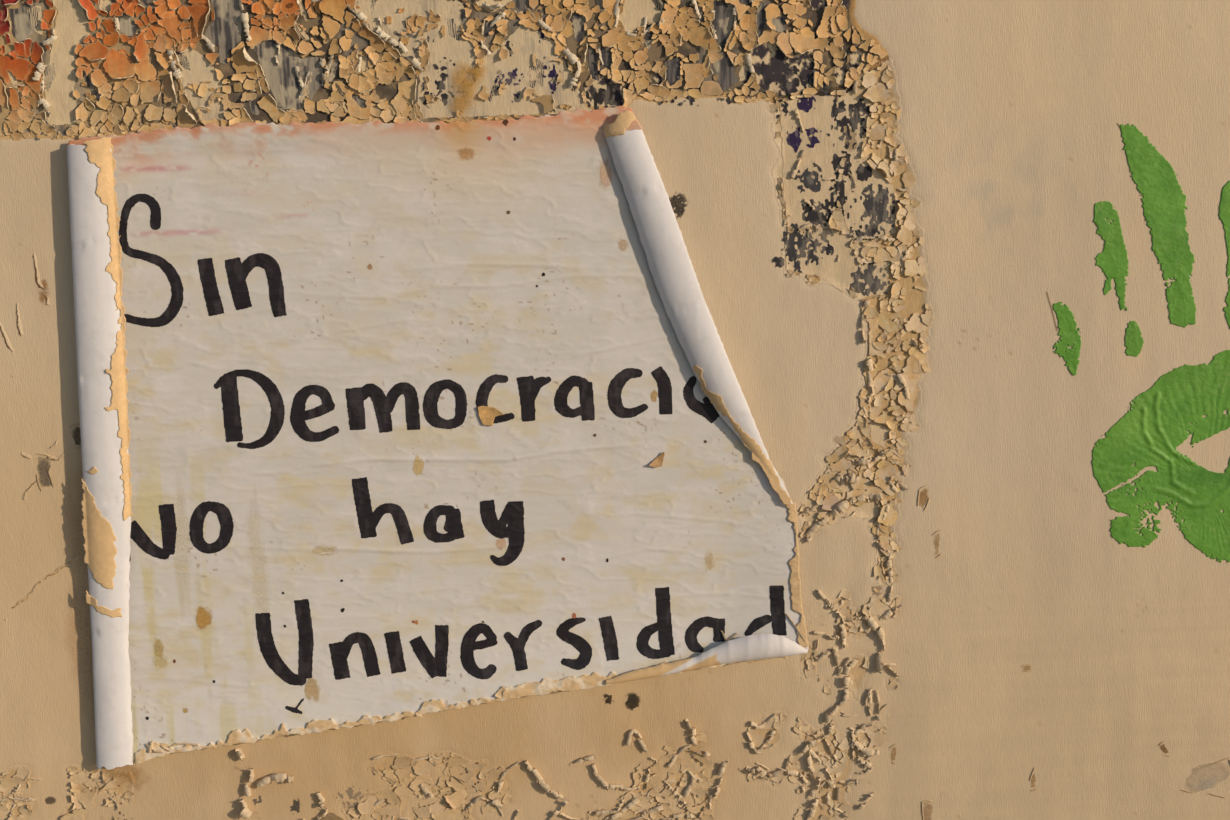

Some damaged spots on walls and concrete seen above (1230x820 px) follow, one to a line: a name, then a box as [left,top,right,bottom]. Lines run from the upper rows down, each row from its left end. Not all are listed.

peeling [0,0,935,820]